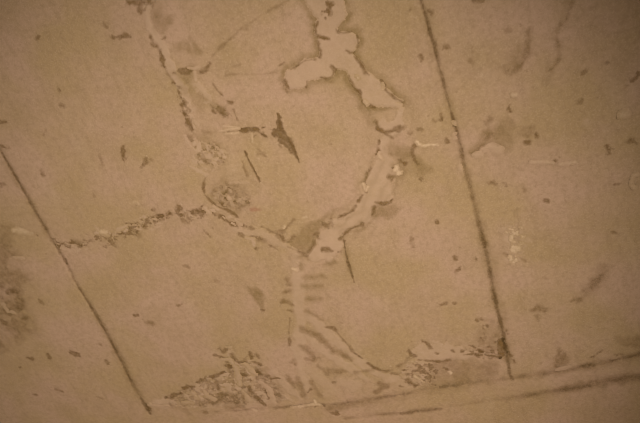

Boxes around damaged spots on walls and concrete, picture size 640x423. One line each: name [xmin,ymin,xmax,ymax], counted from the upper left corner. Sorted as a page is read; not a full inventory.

crack [55,151,298,256]
water stain [127,0,482,413]